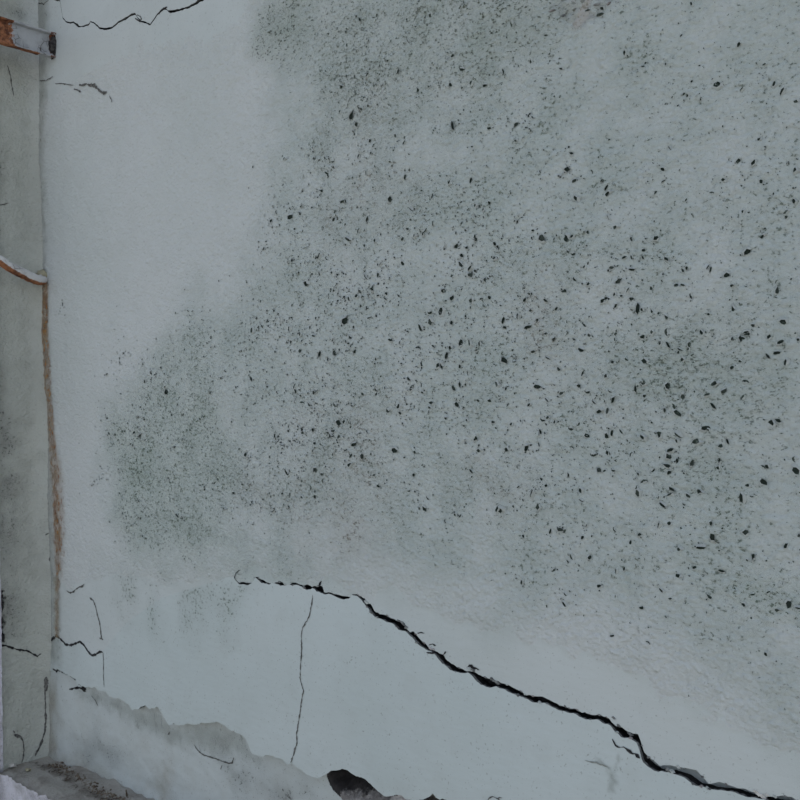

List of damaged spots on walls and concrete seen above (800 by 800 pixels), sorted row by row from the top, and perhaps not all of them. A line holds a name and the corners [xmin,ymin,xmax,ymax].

crack [38,0,204,30]
water stain [308,0,611,119]
corrosion [41,284,64,590]
mould [105,337,240,571]
crack [2,584,104,762]
crack [194,745,234,769]
spalling [327,769,410,800]
crack [234,570,787,800]